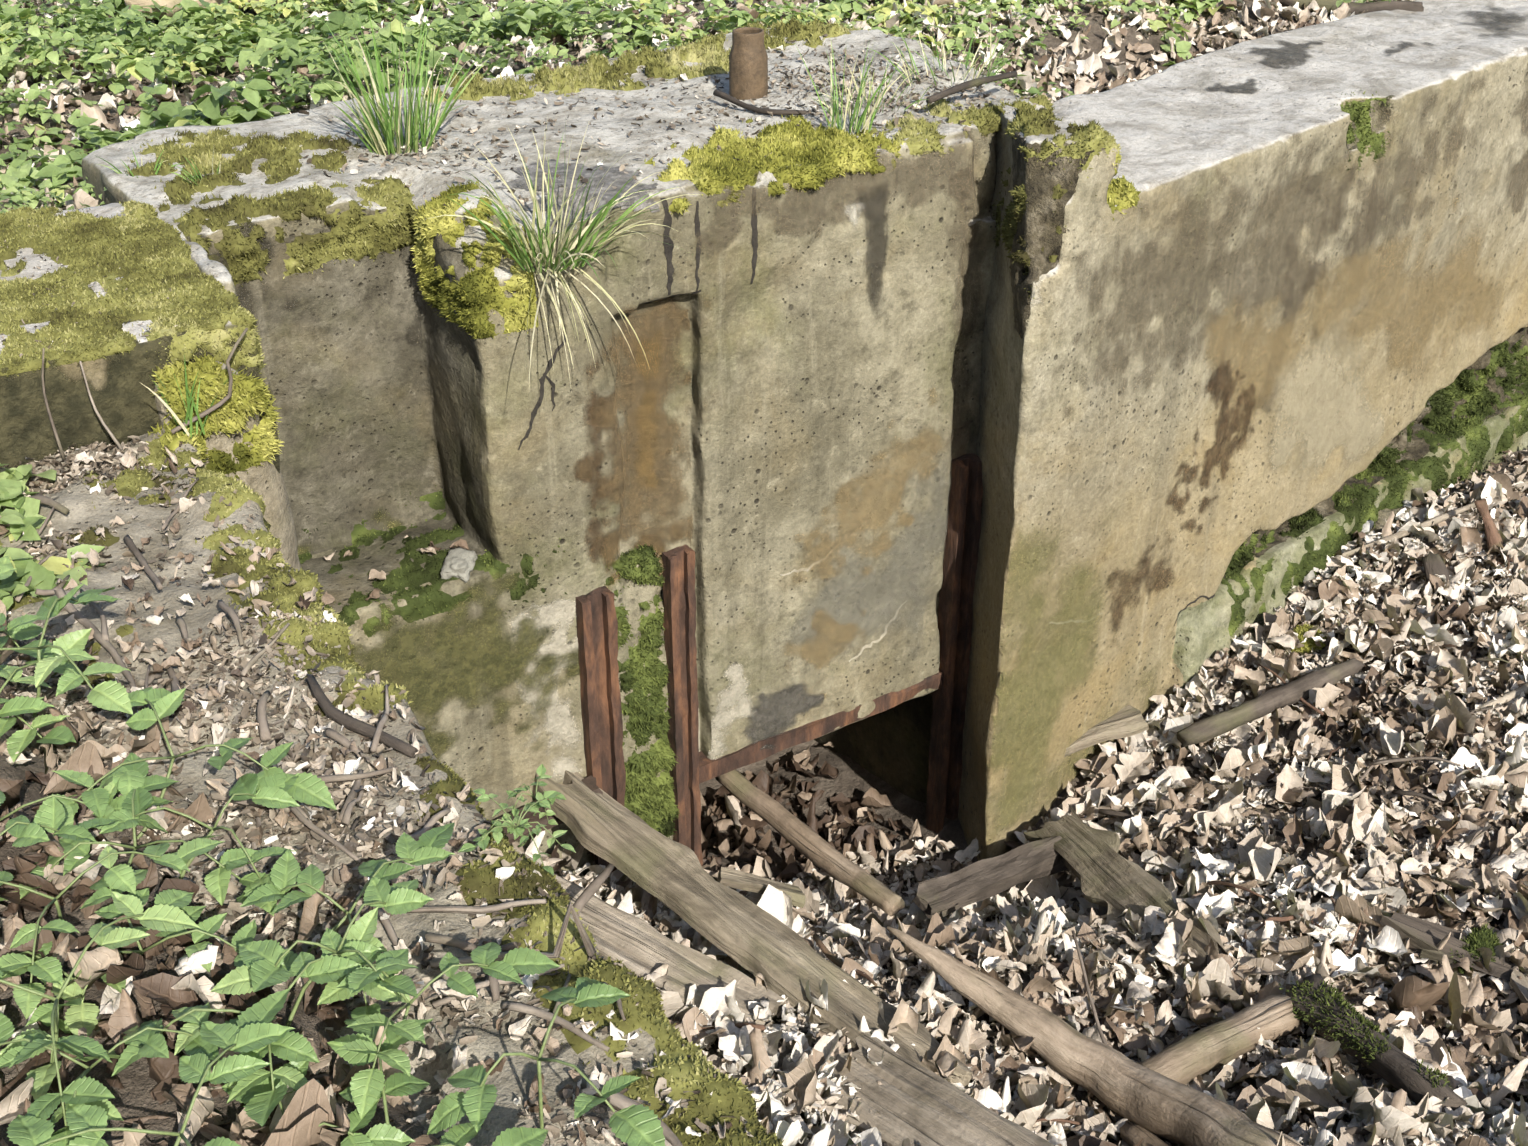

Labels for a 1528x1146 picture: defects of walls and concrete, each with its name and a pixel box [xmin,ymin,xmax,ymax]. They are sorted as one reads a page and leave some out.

leakage [699,126,980,340]
spalling [991,131,1106,339]
corrosion [576,296,694,579]
leakage [952,361,970,458]